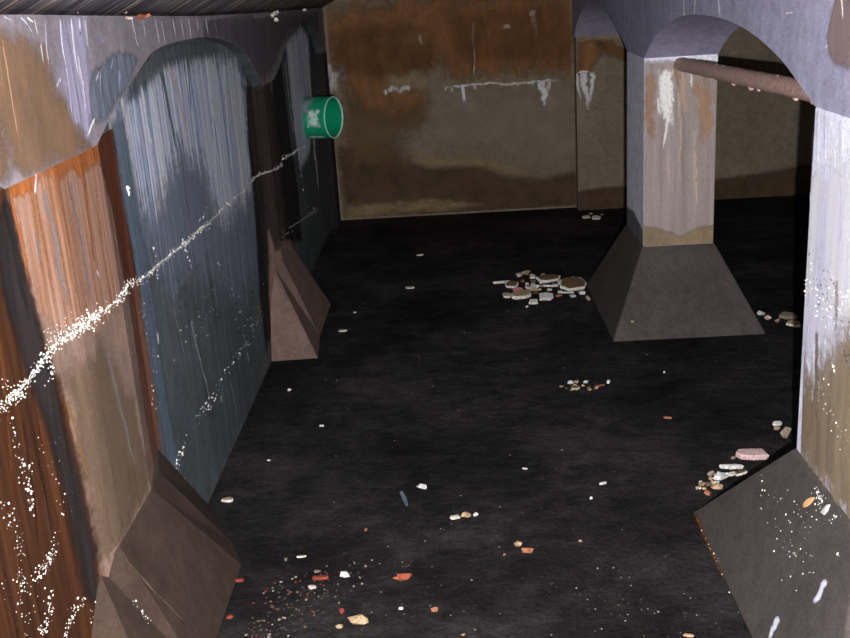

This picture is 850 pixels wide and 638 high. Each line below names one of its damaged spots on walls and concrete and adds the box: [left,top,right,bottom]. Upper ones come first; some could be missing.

leakage [34,175,67,299]
rust [0,32,160,466]
crack [0,146,305,413]
leakage [56,11,319,475]
efflorescence [385,72,426,94]
rust [327,0,627,120]
leakage [424,65,596,163]
leakage [339,103,713,247]
efflorescence [657,70,675,147]
rust [643,61,717,245]
leakage [714,109,850,528]
rust [0,265,100,638]